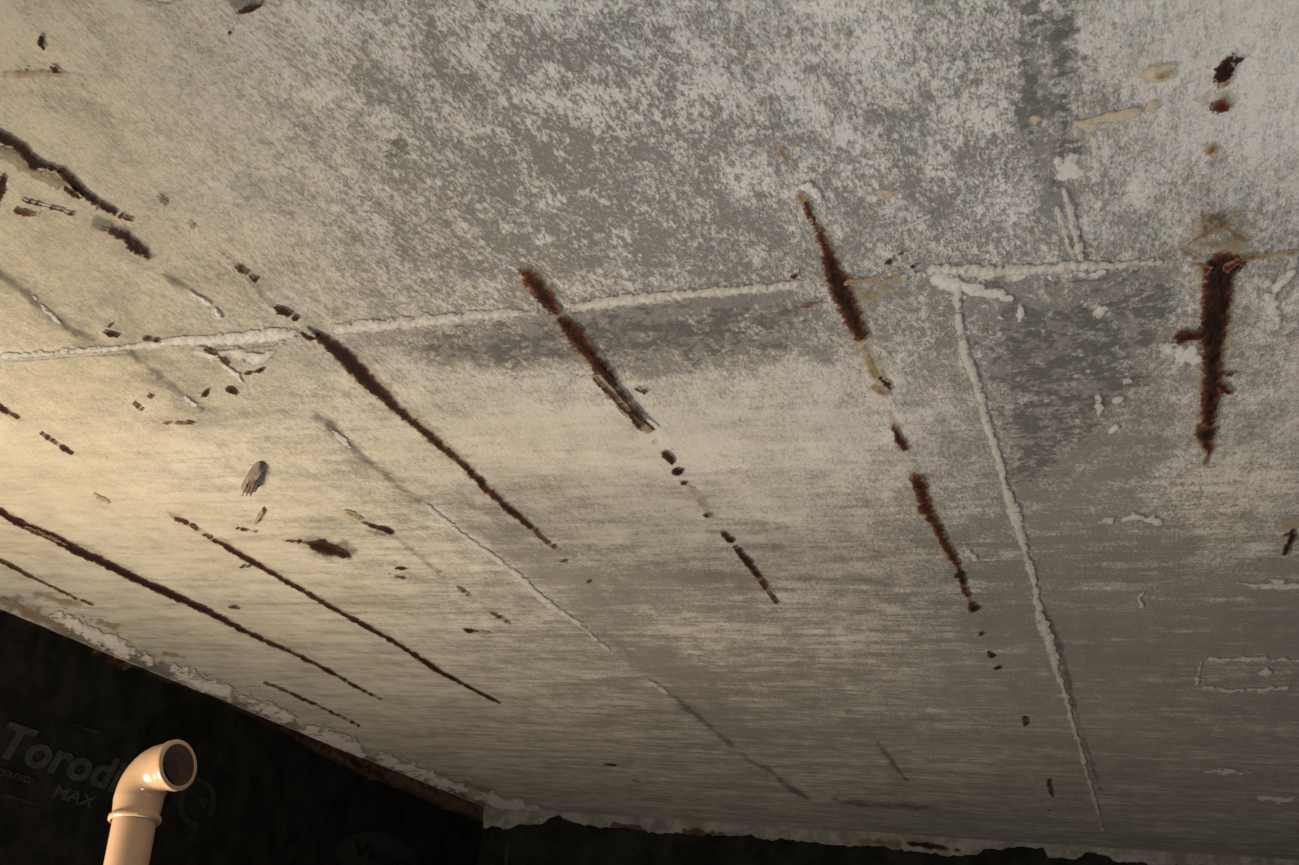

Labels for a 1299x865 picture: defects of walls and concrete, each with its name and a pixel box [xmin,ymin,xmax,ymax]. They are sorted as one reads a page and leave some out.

rust [0,176,40,217]
rust [517,269,655,433]
rust [794,181,918,396]
rust [1173,211,1299,465]
rust [661,451,686,485]
rust [891,425,909,452]
rust [720,532,778,604]
rust [909,473,979,614]
rust [0,593,491,821]